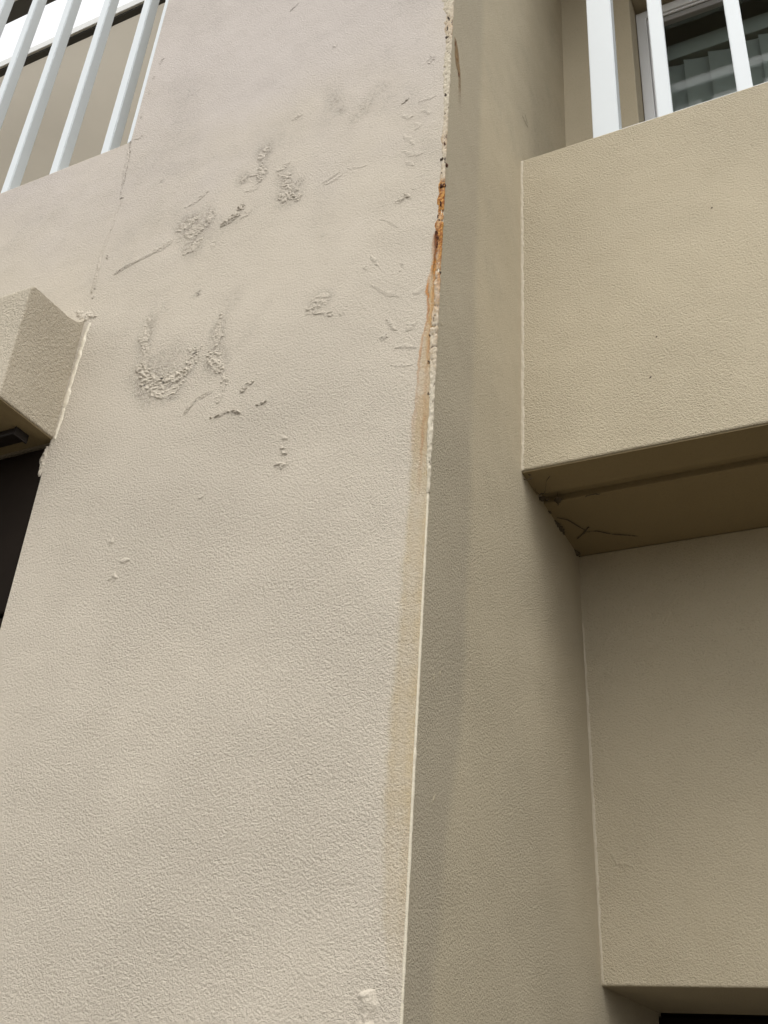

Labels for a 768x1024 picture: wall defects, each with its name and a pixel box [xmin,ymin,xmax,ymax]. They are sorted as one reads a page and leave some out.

peeling [175,146,305,255]
corrosion [426,232,438,325]
peeling [134,313,229,404]